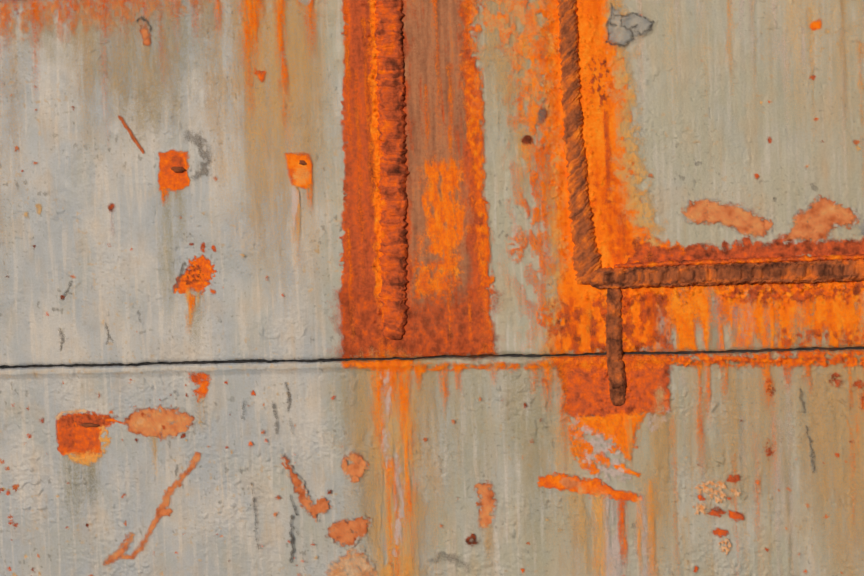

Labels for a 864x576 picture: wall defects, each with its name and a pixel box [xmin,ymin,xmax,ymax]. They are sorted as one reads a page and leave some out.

rust [0,0,223,155]
rust [157,150,190,206]
rust [236,0,325,268]
peeling [681,193,864,244]
rust [173,242,224,334]
peeling [279,450,378,576]